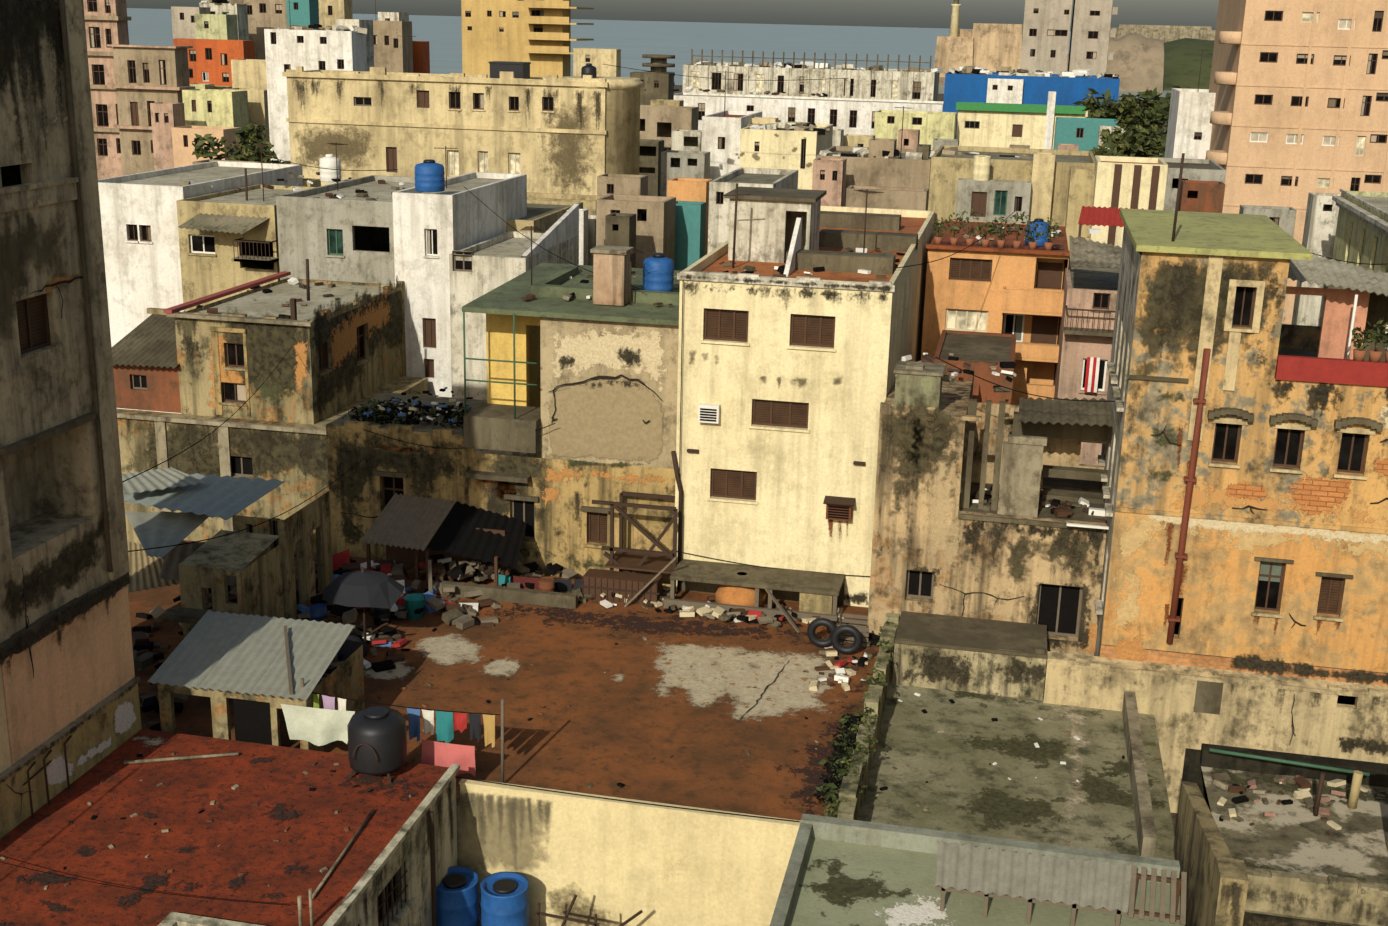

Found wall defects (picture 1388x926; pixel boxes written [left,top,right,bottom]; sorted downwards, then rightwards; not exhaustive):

water stain [0,0,64,153]
water stain [174,319,201,363]
water stain [220,276,405,414]
water stain [126,411,545,544]
peeling [550,326,668,393]
water stain [886,397,957,531]
water stain [1154,428,1178,447]
water stain [1121,258,1285,401]
water stain [1272,380,1343,416]
spalling [1373,458,1388,477]
peeling [1083,474,1388,661]
water stain [1333,898,1371,923]